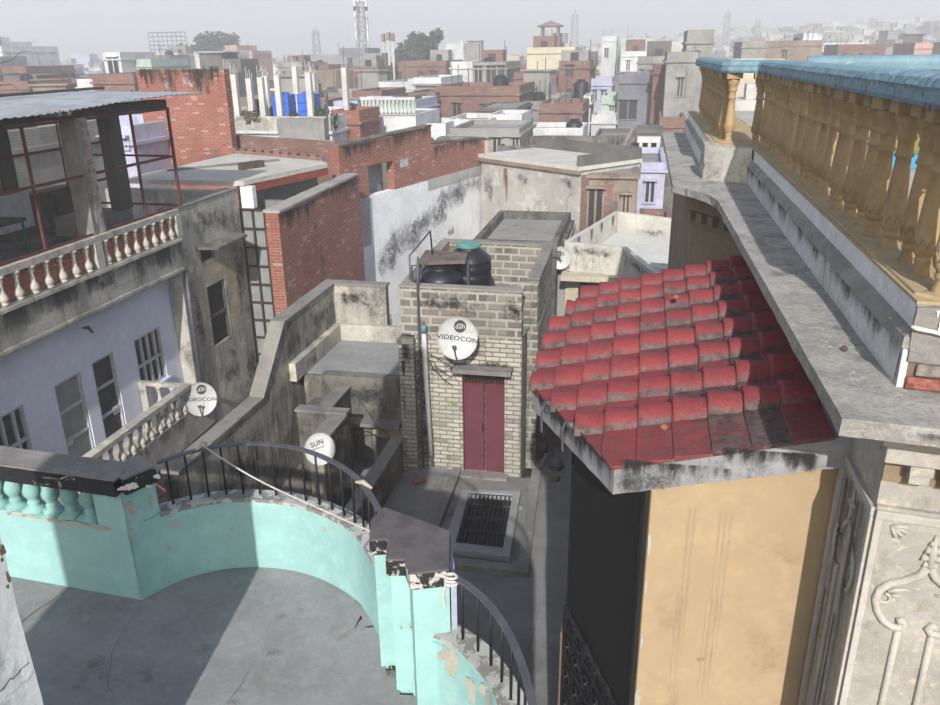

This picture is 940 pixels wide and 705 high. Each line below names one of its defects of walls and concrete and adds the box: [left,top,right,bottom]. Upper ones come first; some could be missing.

spalling [904,362,940,392]
water stain [622,459,696,492]
water stain [724,447,817,470]
peeling [117,474,160,545]
spalling [0,544,11,589]
peeling [437,645,491,705]